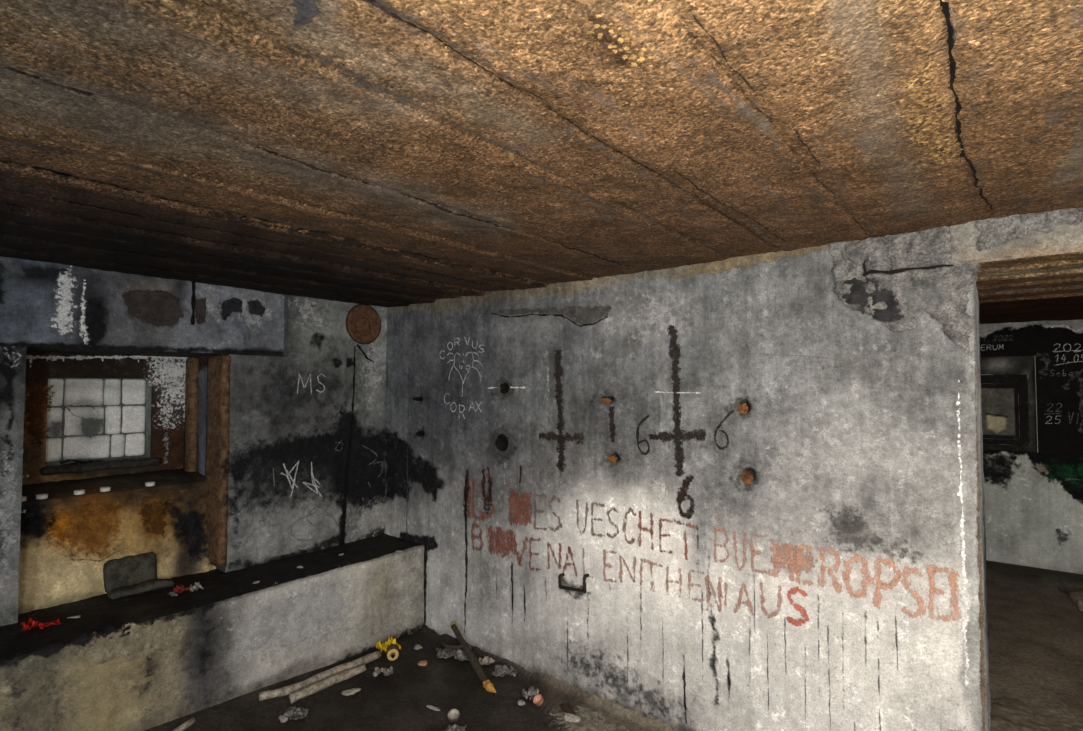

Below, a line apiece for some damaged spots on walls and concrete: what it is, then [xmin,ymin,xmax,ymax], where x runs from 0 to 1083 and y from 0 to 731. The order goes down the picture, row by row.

crack [692,14,755,91]
crack [939,0,993,210]
crack [794,129,821,166]
flaking render [829,207,1083,354]
water stain [0,266,187,589]
corrosion [46,500,123,558]
corrosion [139,496,170,539]